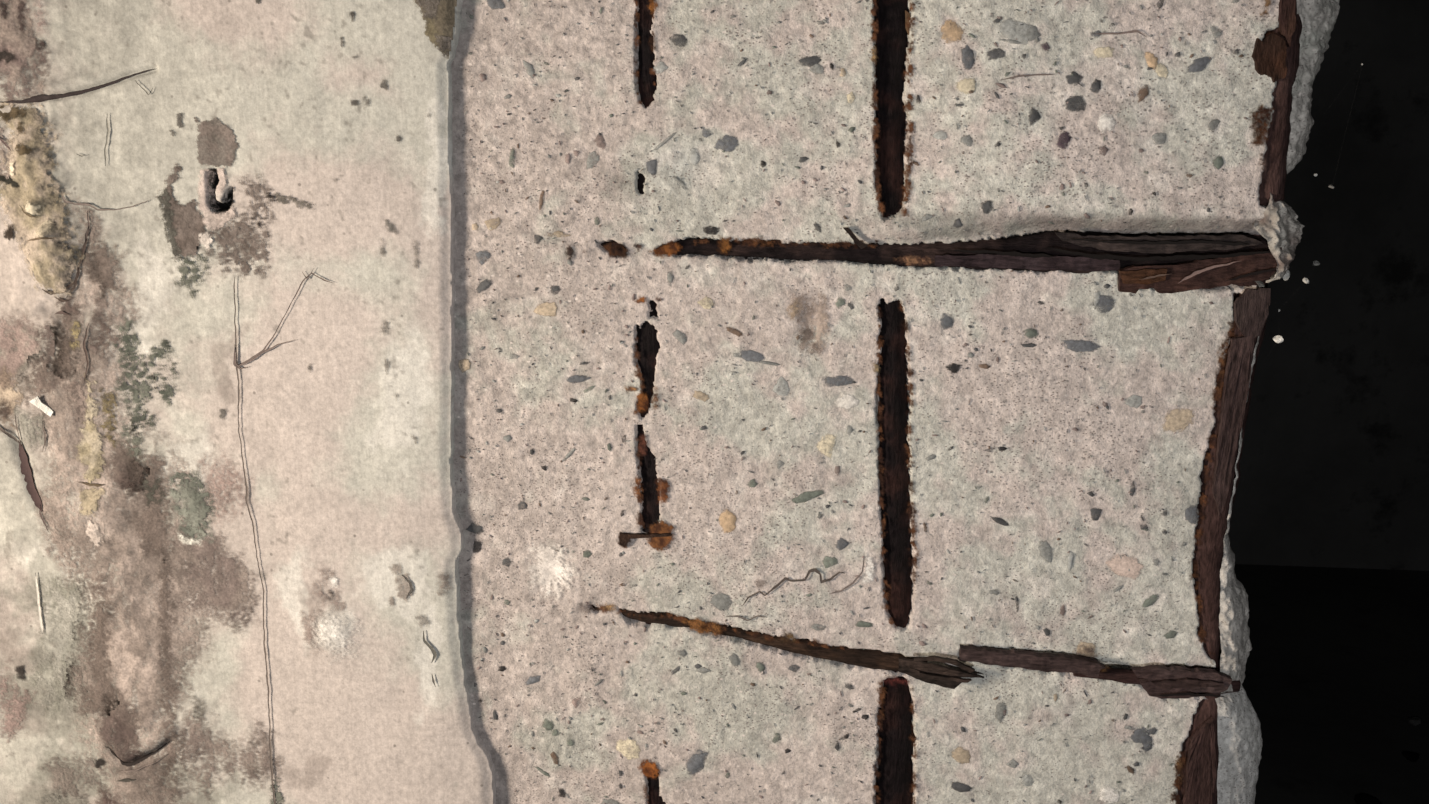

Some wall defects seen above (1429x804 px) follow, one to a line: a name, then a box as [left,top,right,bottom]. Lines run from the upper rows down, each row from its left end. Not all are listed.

crack [0,69,154,166]
corrosion [604,227,878,258]
spalling [415,0,1340,804]
water stain [0,208,284,804]
crack [233,270,332,804]
corrosion [618,435,673,551]
crack [728,557,874,621]